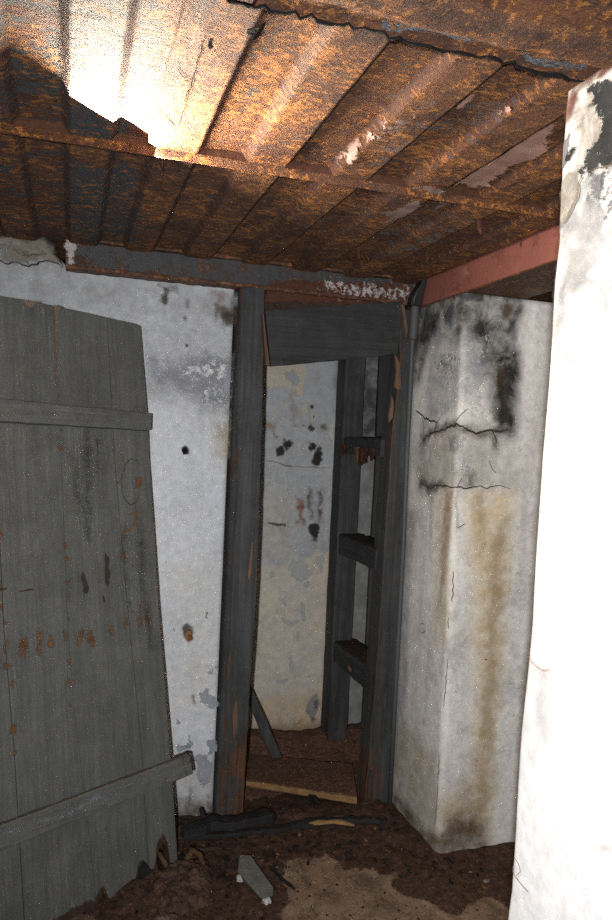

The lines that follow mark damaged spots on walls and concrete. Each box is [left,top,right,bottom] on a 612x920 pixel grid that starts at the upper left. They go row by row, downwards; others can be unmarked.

spalling [0,236,79,264]
peeling [264,276,415,308]
damp [276,440,293,456]
damp [309,443,322,466]
crack [416,409,511,489]
damp [309,524,320,541]
peeling [199,688,220,709]
peeling [176,736,217,788]